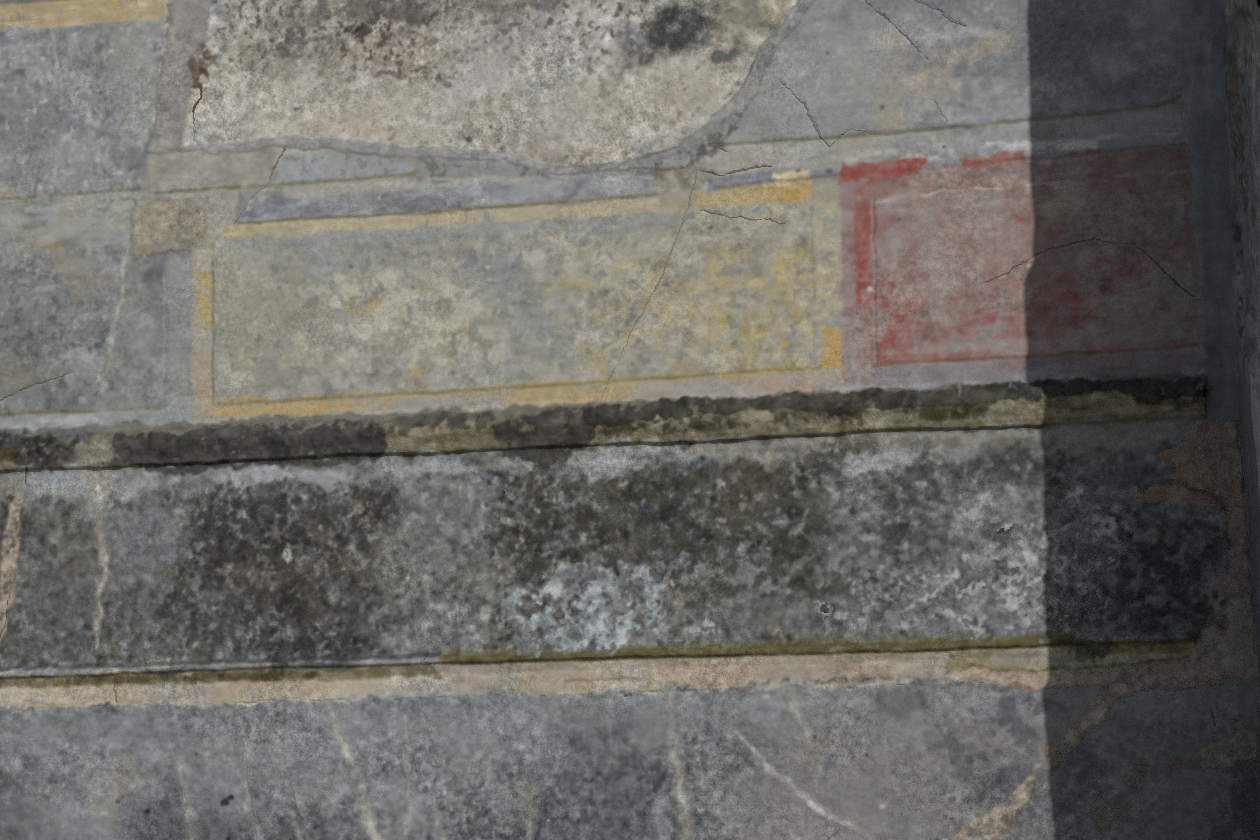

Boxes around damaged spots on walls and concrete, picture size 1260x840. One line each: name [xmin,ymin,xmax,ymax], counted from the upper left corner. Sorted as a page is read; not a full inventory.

flaking render [154,0,799,172]
crack [779,80,872,147]
crack [865,0,929,60]
crack [916,0,966,26]
crack [597,144,786,406]
crack [980,238,1200,301]
crack [0,441,28,641]
spalling [933,420,1259,691]
crack [941,669,1143,840]